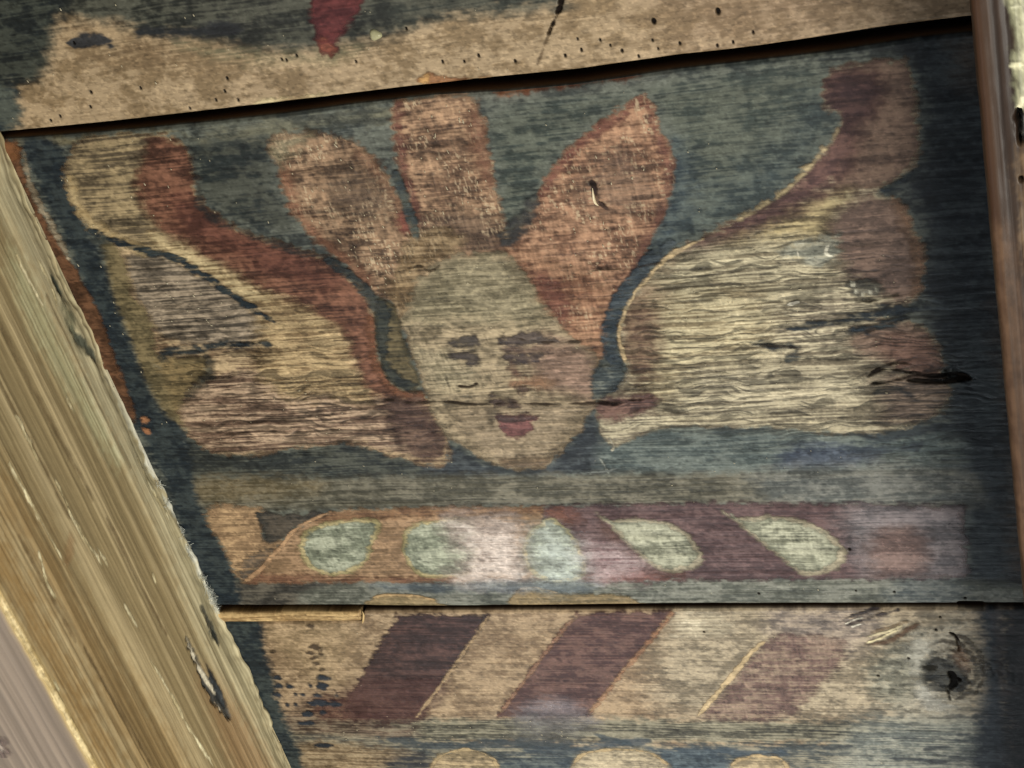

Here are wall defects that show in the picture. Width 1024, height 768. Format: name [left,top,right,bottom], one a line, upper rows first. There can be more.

crack [538,0,564,61]
crack [867,362,972,385]